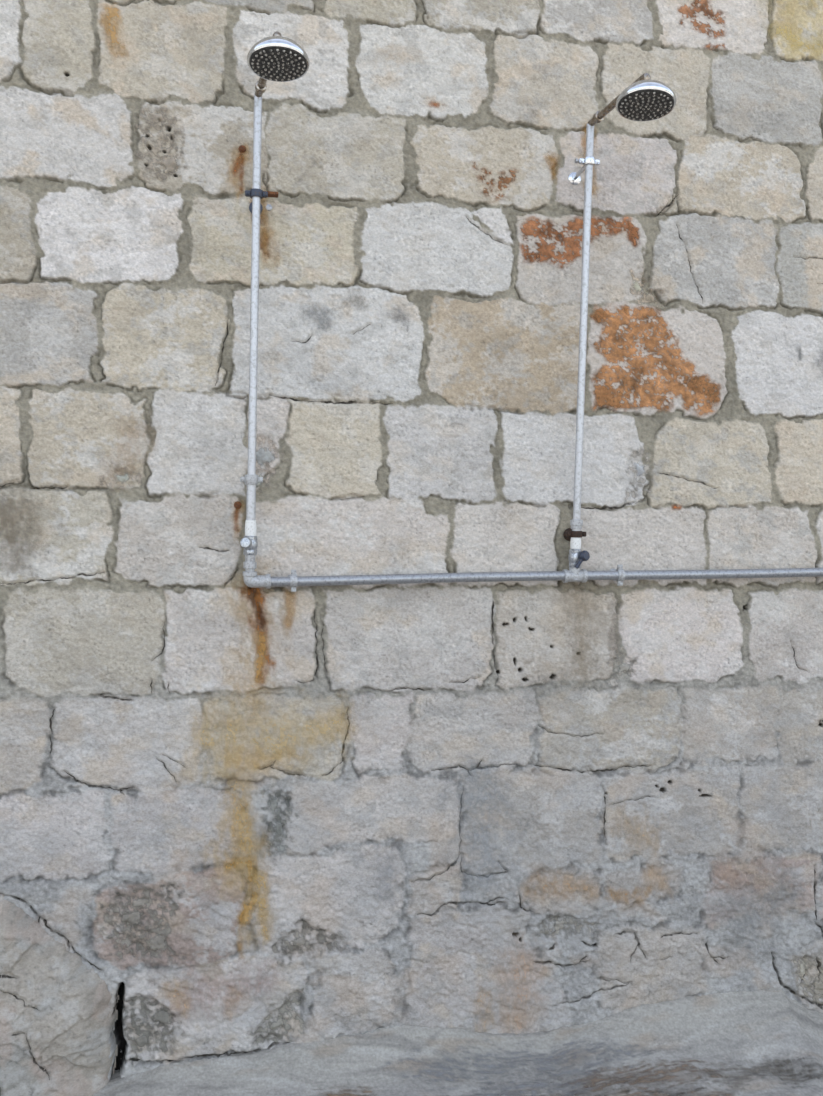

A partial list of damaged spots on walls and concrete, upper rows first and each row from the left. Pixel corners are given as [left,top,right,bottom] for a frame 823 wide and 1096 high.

rust [242,587,275,680]
crack [417,761,650,916]
crack [0,975,38,1010]
crack [535,931,725,1003]
crack [771,870,823,1009]